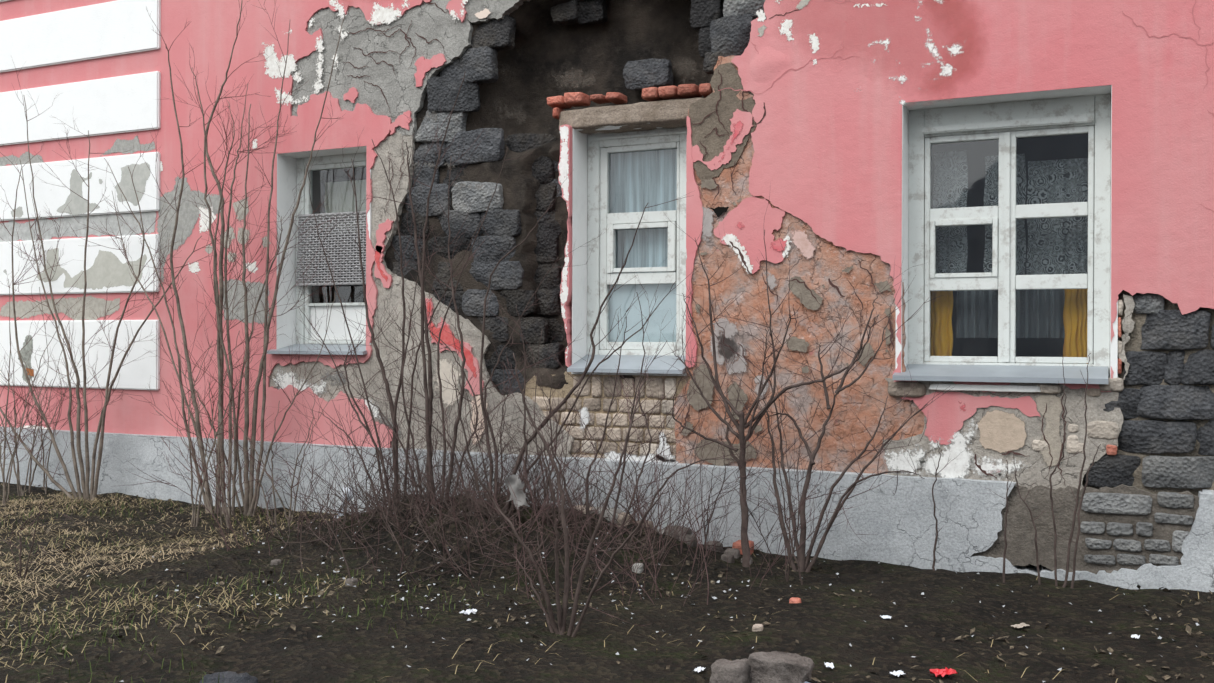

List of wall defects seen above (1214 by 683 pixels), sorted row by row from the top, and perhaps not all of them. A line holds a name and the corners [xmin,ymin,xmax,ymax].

crack [1122,0,1214,116]
peeling [18,335,34,383]
peeling [0,135,271,324]
spalling [262,0,1214,574]